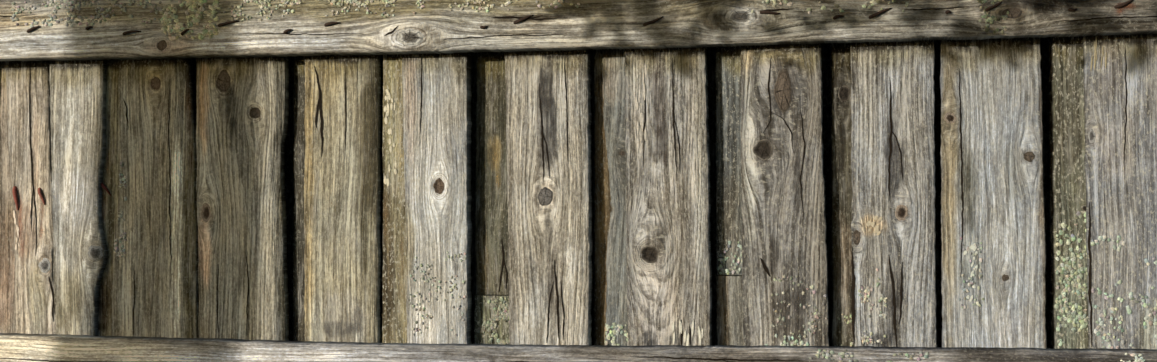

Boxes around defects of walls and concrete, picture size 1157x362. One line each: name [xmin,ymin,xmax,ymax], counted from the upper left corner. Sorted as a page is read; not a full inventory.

crack [314,66,347,157]
crack [888,78,903,201]